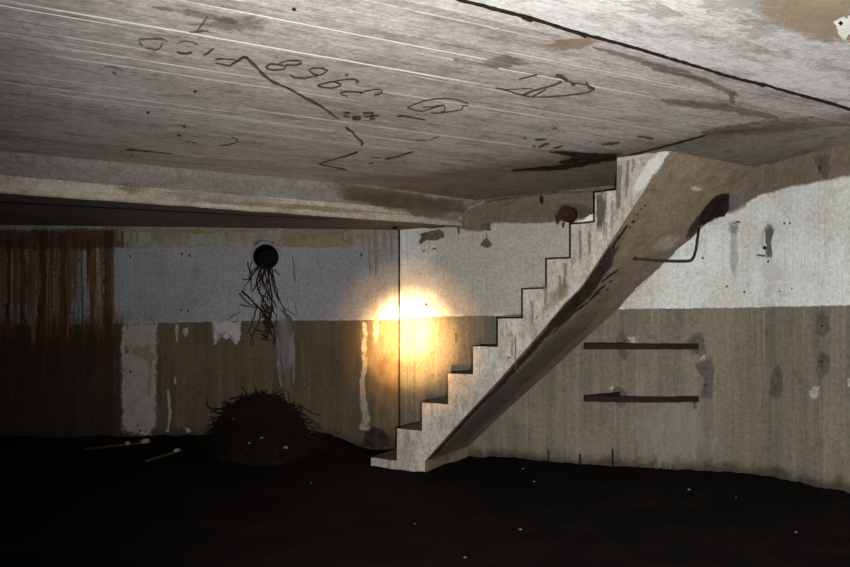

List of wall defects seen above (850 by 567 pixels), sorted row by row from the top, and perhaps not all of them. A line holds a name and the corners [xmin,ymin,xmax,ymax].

water stain [512,142,669,232]
water stain [655,191,750,250]
corrosion [0,226,124,438]
peeling [120,316,158,436]
peeling [212,321,242,345]